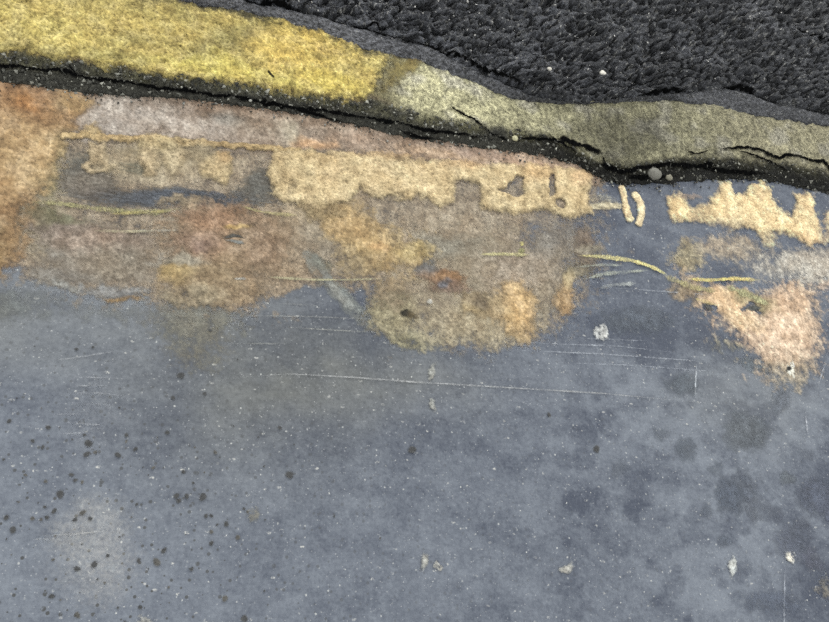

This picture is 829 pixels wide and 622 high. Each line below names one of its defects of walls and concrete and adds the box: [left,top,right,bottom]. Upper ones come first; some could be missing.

crack [331,19,525,86]
corrosion [0,81,101,272]
crack [0,64,829,180]
corrosion [158,193,291,310]
corrosion [306,204,537,342]
corrosion [555,229,600,314]
corrosion [669,276,829,384]